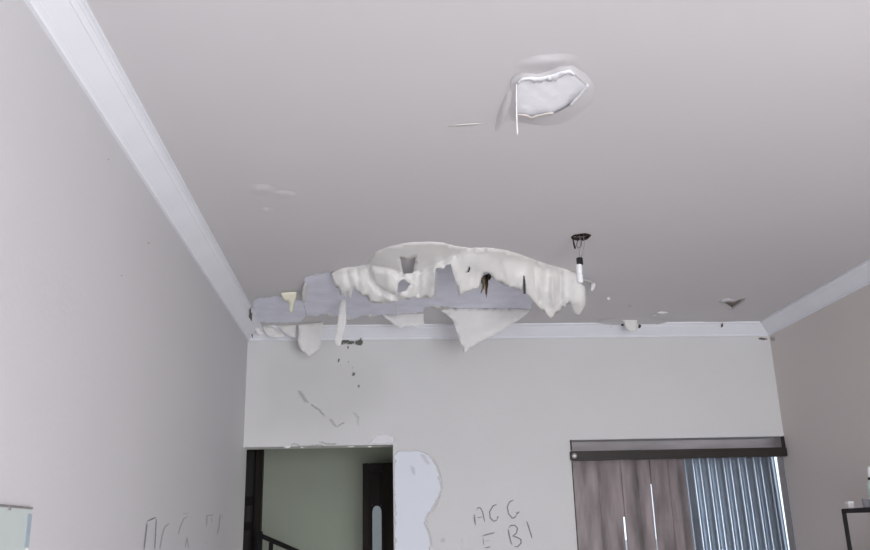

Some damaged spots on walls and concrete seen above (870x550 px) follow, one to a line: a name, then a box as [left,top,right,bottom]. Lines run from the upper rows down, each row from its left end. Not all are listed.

peeling [509,65,594,135]
peeling [253,242,595,356]
peeling [706,298,747,327]
peeling [394,451,441,550]